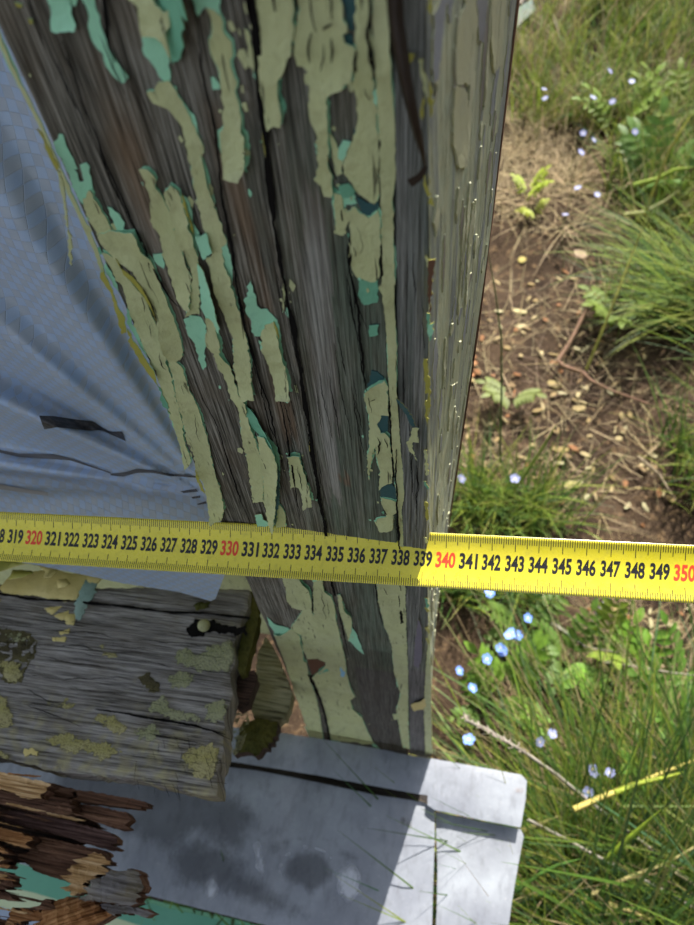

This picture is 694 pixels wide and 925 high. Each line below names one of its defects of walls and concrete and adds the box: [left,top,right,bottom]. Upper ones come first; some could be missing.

peeling [0,0,314,534]
peeling [244,0,450,547]
peeling [442,323,473,450]
peeling [451,0,507,317]
peeling [267,578,380,749]
peeling [376,584,440,755]